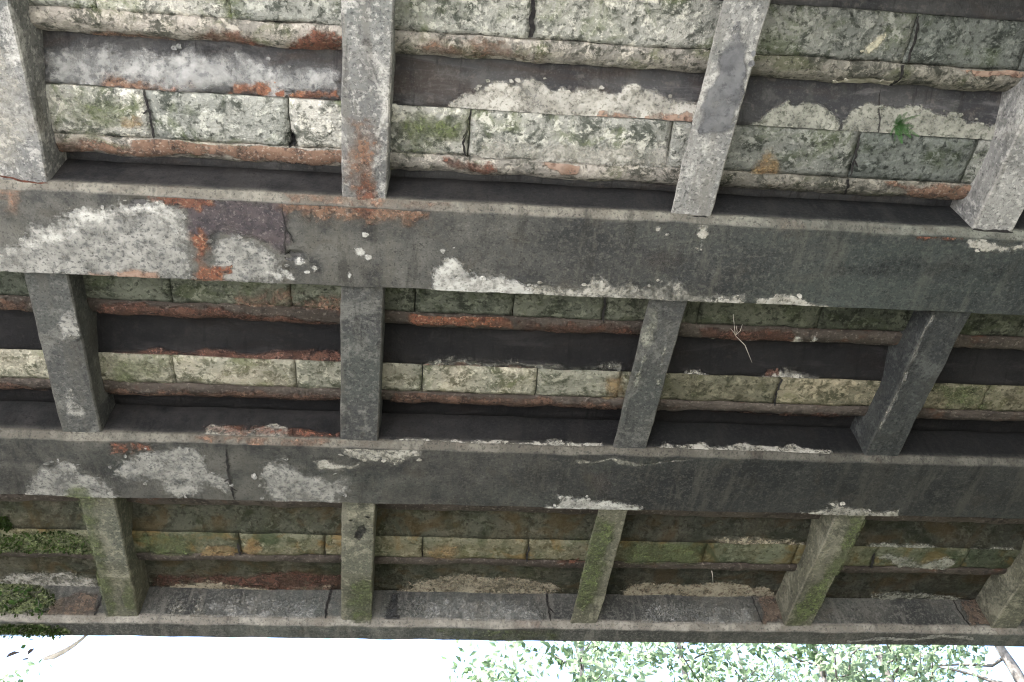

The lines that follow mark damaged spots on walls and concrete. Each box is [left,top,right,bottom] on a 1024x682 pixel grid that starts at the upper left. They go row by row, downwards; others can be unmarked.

crack [528,0,536,38]
efflorescence [48,44,336,96]
rust [228,82,339,98]
efflorescence [450,77,697,120]
efflorescence [753,100,995,140]
rust [56,117,432,226]
leakage [19,198,291,254]
crack [282,205,294,254]
rust [191,230,233,281]
leakage [433,247,684,301]
rust [410,313,512,328]
crack [224,449,237,500]